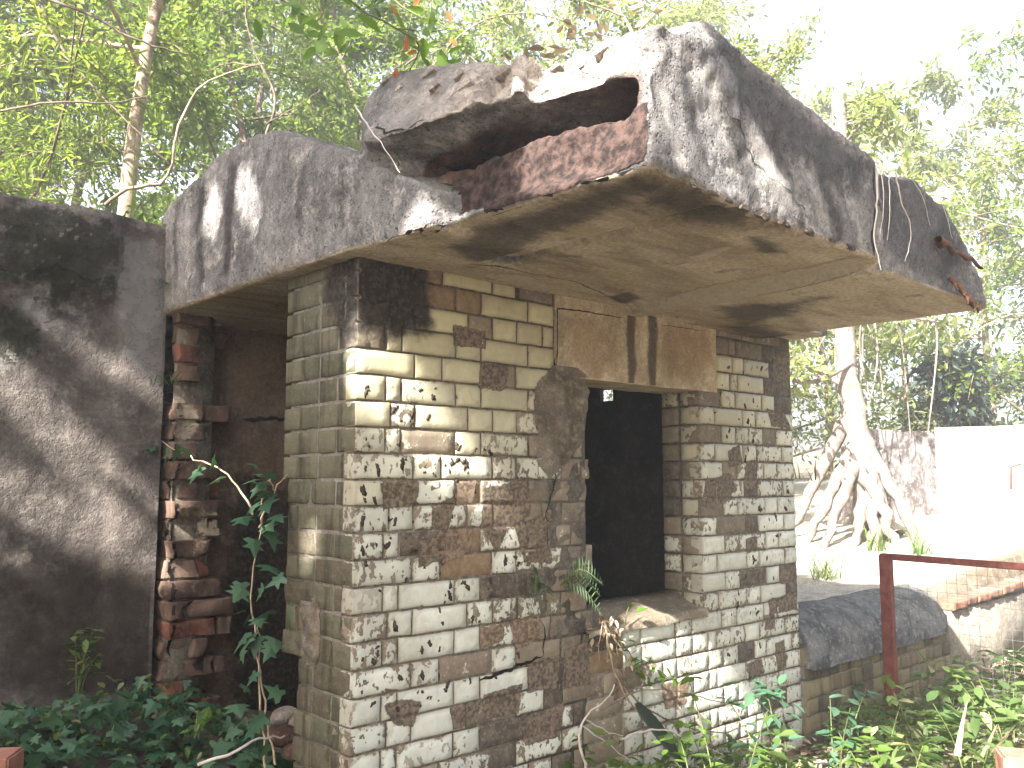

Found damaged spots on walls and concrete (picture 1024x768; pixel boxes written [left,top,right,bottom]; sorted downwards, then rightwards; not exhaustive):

spalling [439,101,650,216]
corrosion [933,236,984,270]
leakage [323,257,434,344]
leakage [626,315,657,387]
leakage [725,301,807,339]
corrosion [947,276,980,313]
crack [243,415,285,423]
peeling [360,438,553,626]
crack [534,465,557,551]
peeling [361,670,450,727]
crack [479,623,546,681]
peeling [450,614,590,746]